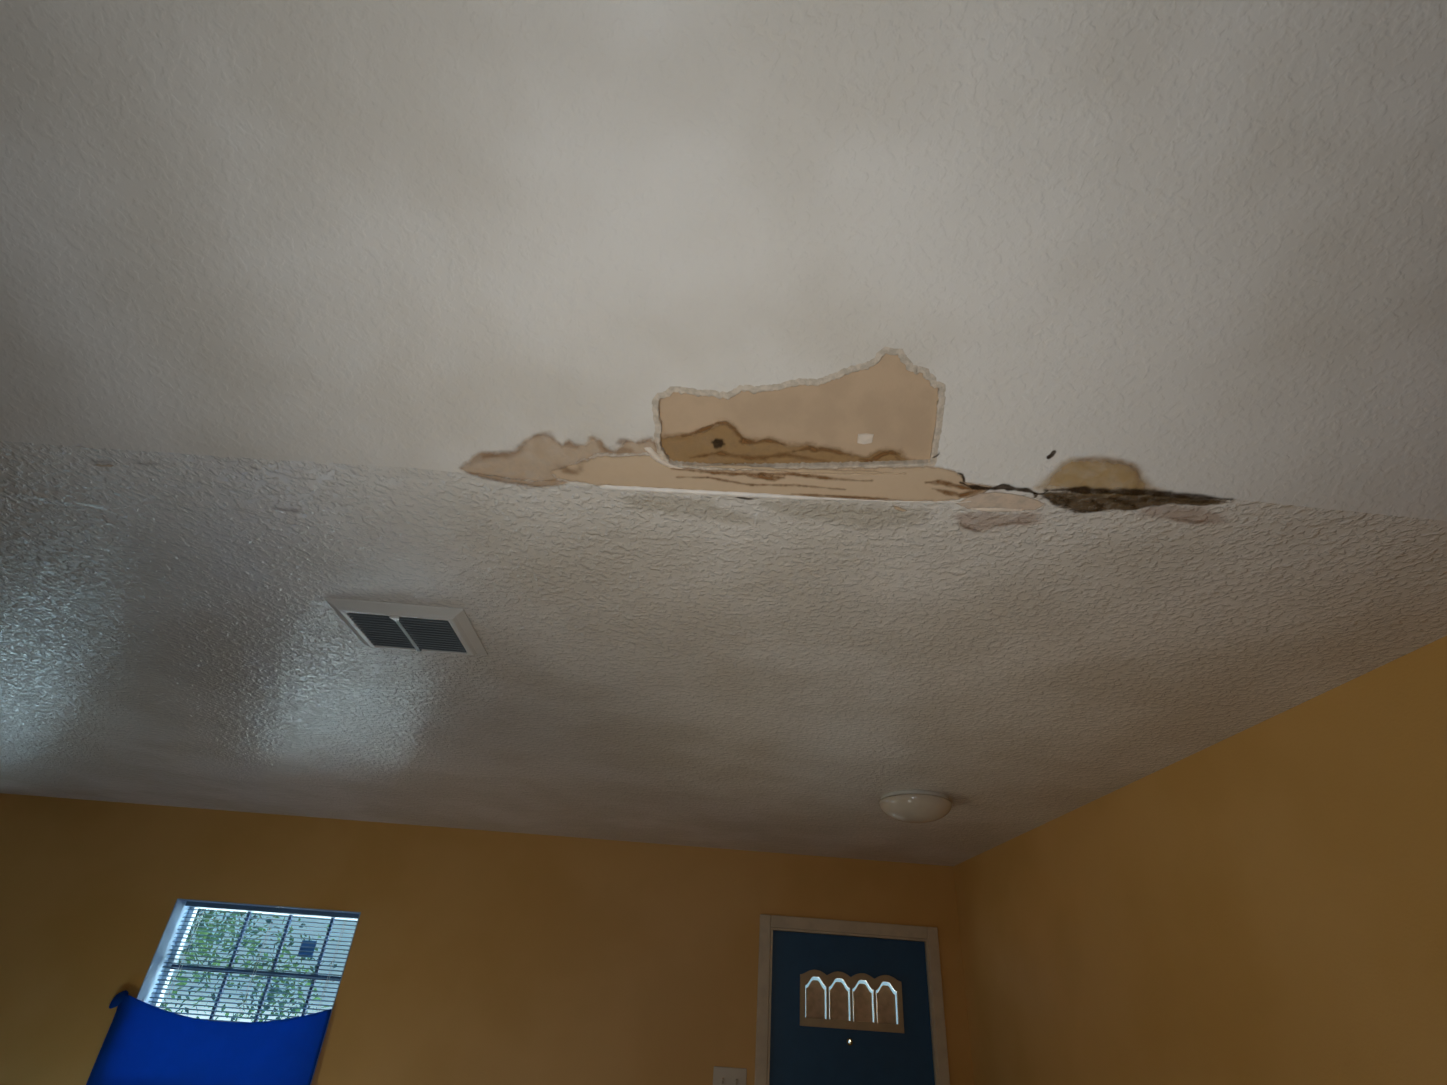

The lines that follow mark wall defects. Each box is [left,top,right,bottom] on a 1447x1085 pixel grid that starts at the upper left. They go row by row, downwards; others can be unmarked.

spalling [551,347,1044,512]